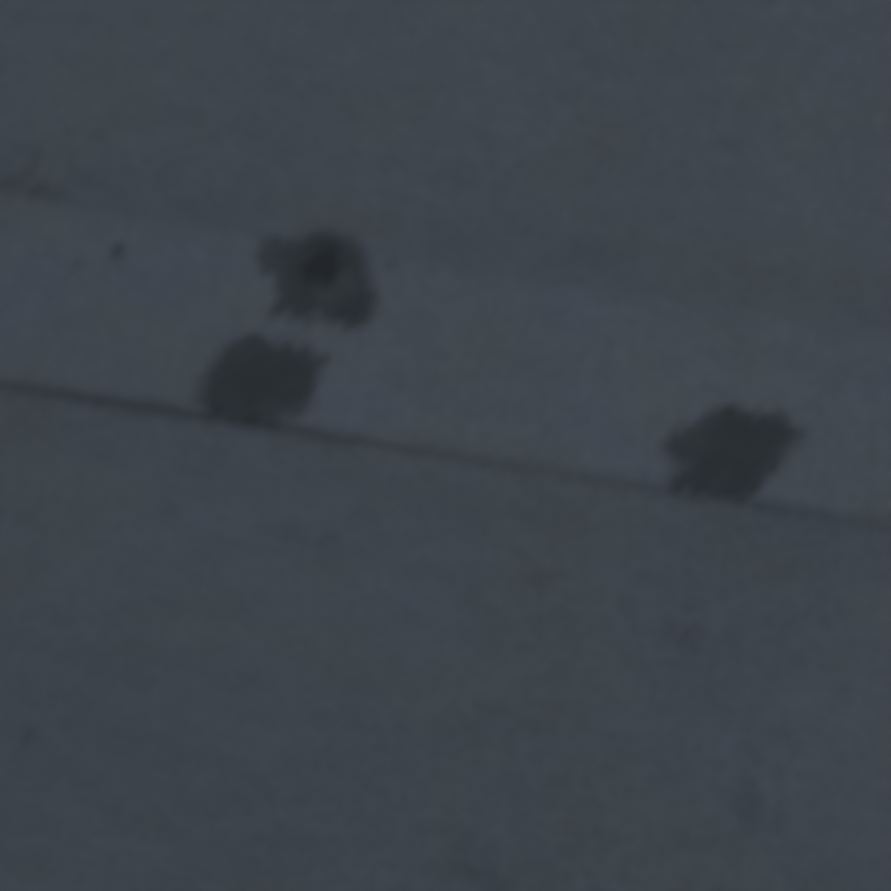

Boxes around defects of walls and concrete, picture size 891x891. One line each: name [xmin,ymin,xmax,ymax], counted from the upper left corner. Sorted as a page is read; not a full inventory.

water stain [261,235,373,324]
water stain [207,337,324,422]
water stain [668,407,793,494]